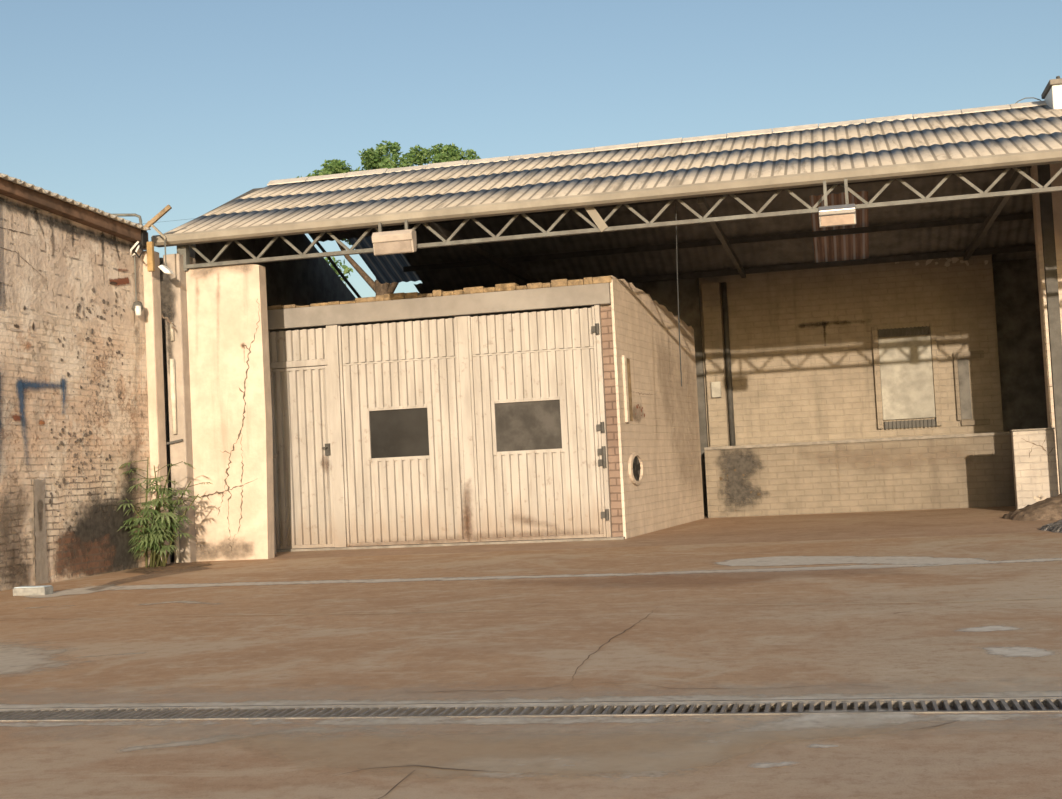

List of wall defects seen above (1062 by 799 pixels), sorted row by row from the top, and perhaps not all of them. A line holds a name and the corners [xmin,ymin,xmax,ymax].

flaking render [0,507,32,586]
flaking render [49,269,129,578]
water stain [65,451,138,577]
crack [194,301,260,550]
water stain [719,450,767,511]